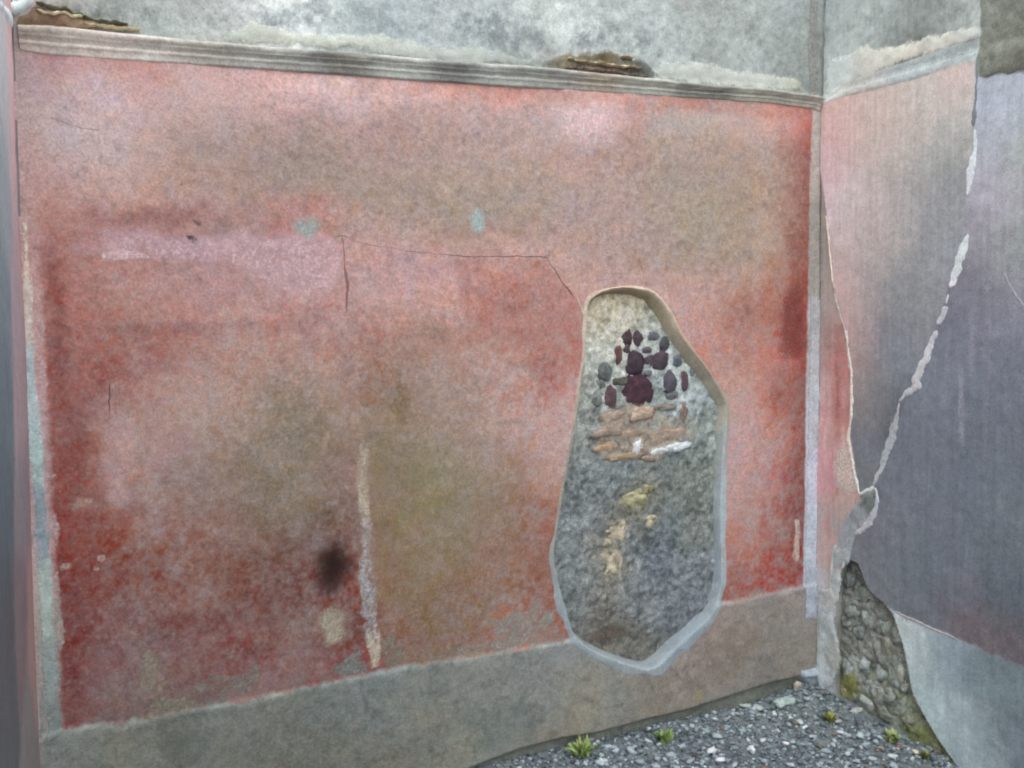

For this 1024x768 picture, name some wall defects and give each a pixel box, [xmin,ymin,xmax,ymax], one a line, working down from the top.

crack [966,63,978,195]
crack [337,235,584,319]
crack [819,173,969,494]
water stain [322,548,348,588]
peeling [335,445,404,675]
spalling [491,285,730,676]